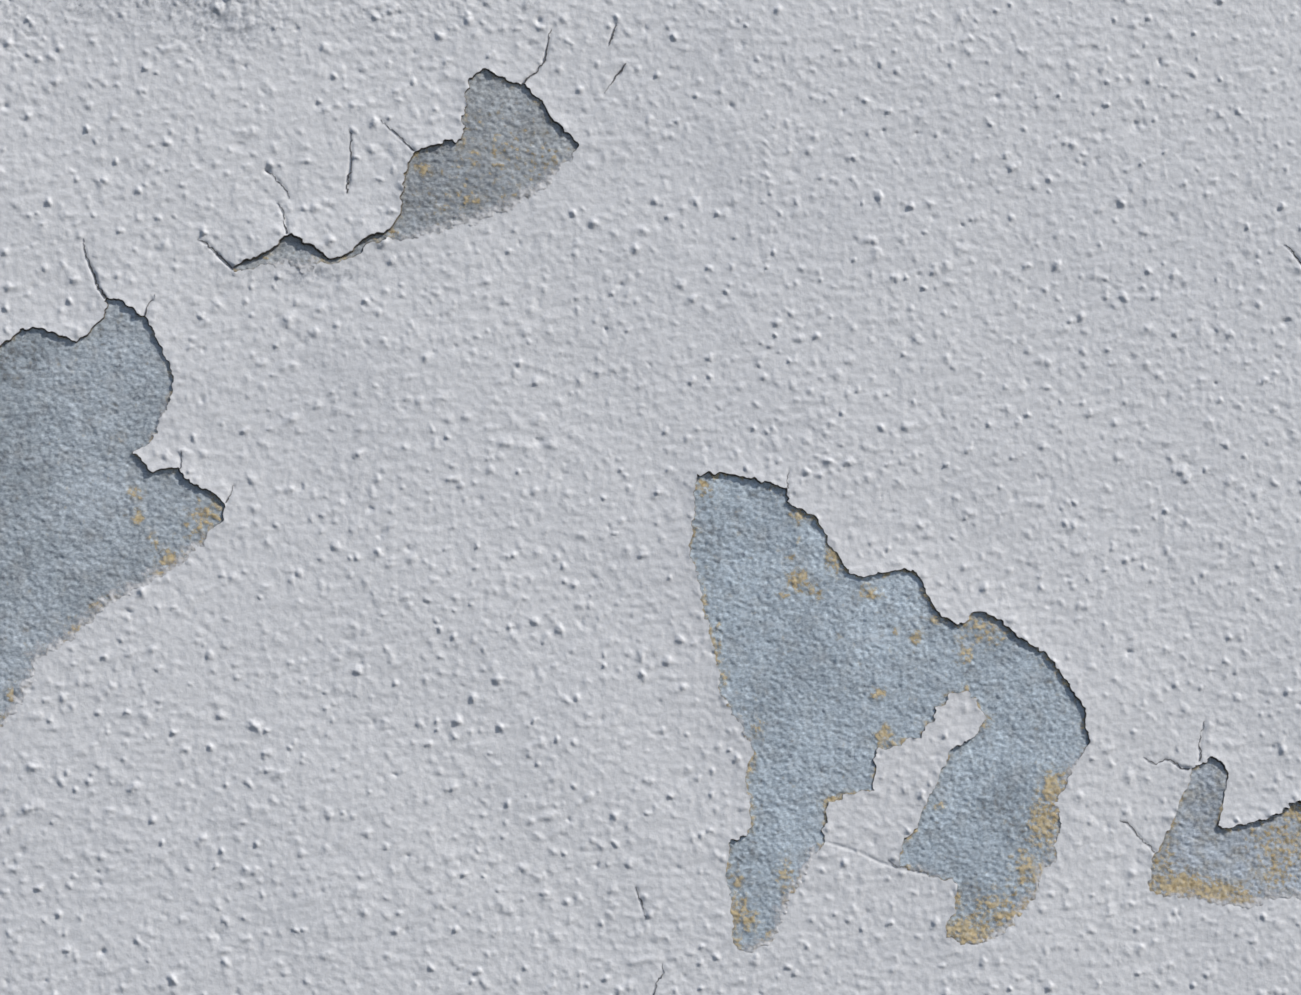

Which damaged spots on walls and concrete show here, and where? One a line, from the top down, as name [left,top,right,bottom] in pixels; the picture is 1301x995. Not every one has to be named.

peeling [198,29,579,274]
peeling [0,241,233,728]
peeling [688,471,1090,953]
peeling [1121,728,1301,909]